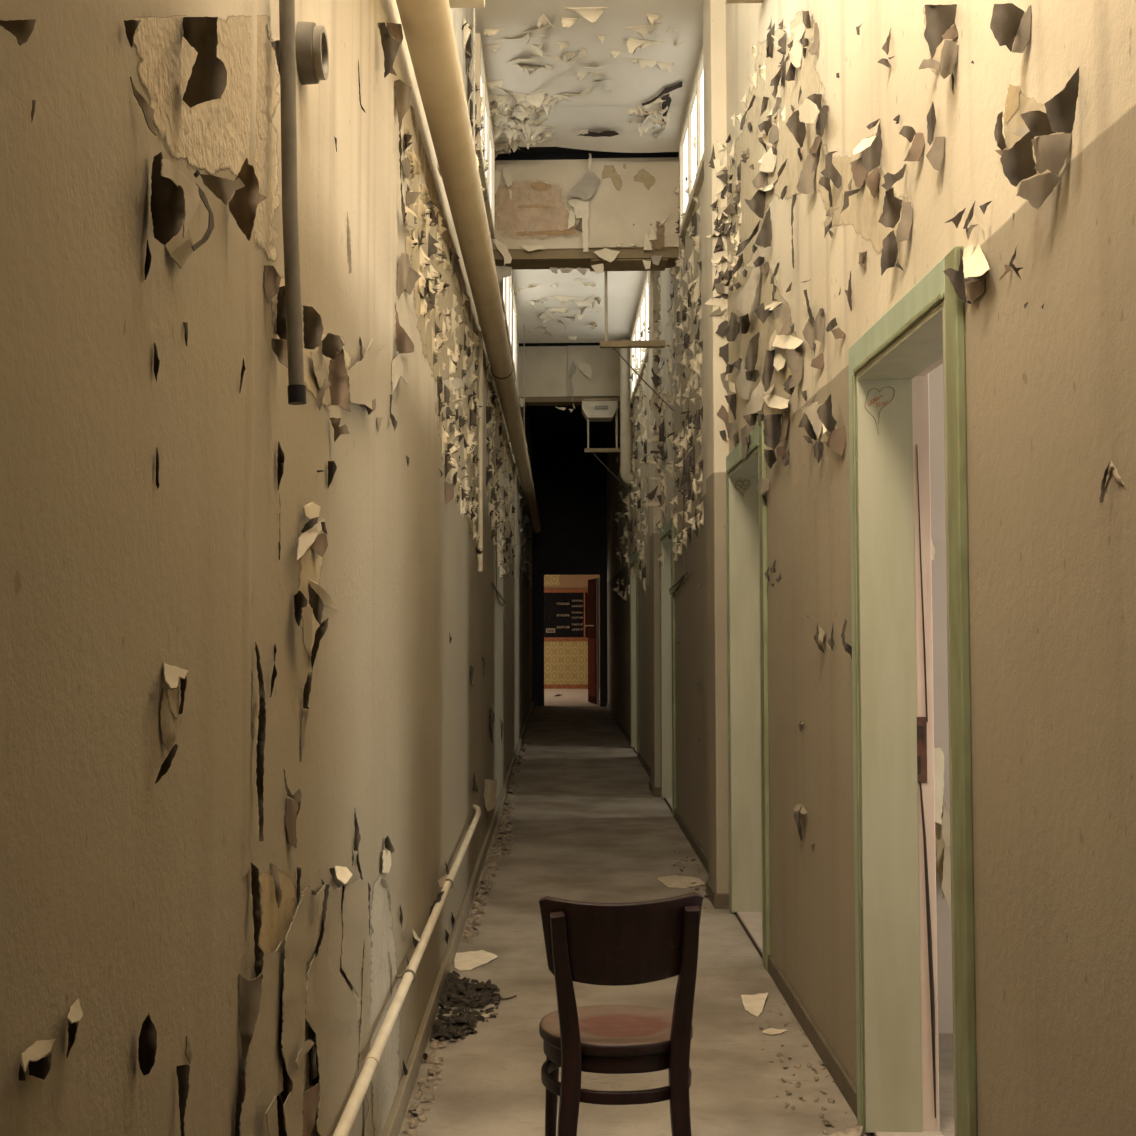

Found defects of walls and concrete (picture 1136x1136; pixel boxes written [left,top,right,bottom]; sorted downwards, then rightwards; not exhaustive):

peeling [0,19,36,46]
peeling [919,4,958,95]
peeling [990,3,1032,53]
peeling [124,15,288,368]
peeling [301,22,532,587]
peeling [462,7,946,601]
peeling [943,201,1023,304]
peeling [994,67,1080,209]
peeling [294,502,339,762]
peeling [155,663,188,784]
peeling [18,999,83,1081]
peeling [235,811,421,1136]